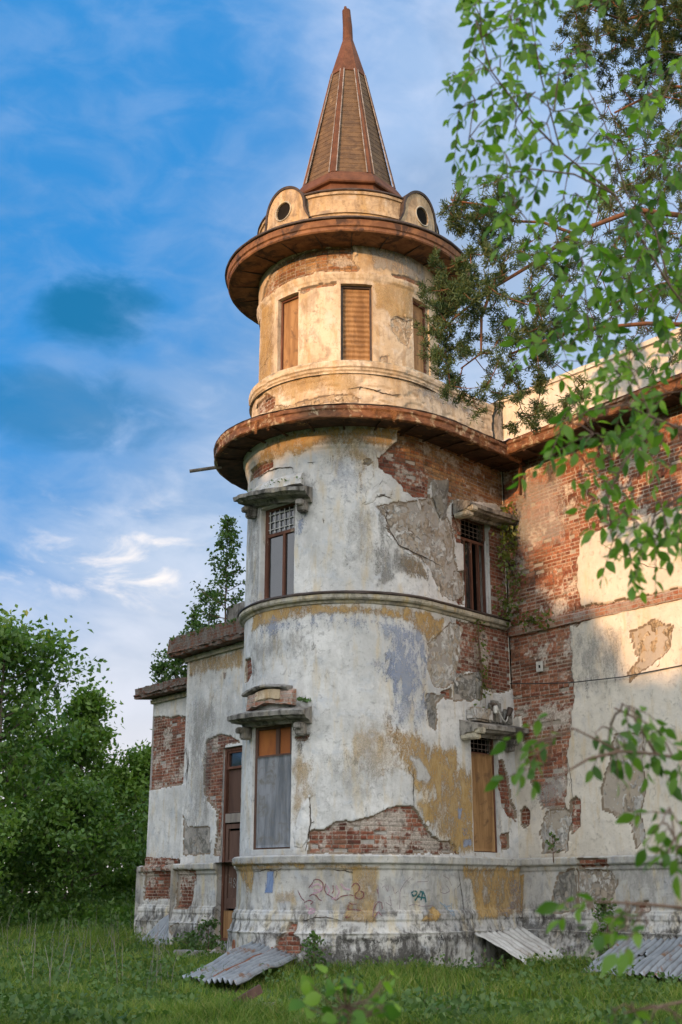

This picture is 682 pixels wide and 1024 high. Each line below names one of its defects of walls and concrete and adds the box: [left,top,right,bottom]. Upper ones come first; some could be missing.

flaking render [259,245,358,381]
flaking render [252,404,682,854]
flaking render [151,716,186,790]
flaking render [143,734,240,909]
peeling [234,862,305,891]
flaking render [309,725,476,922]